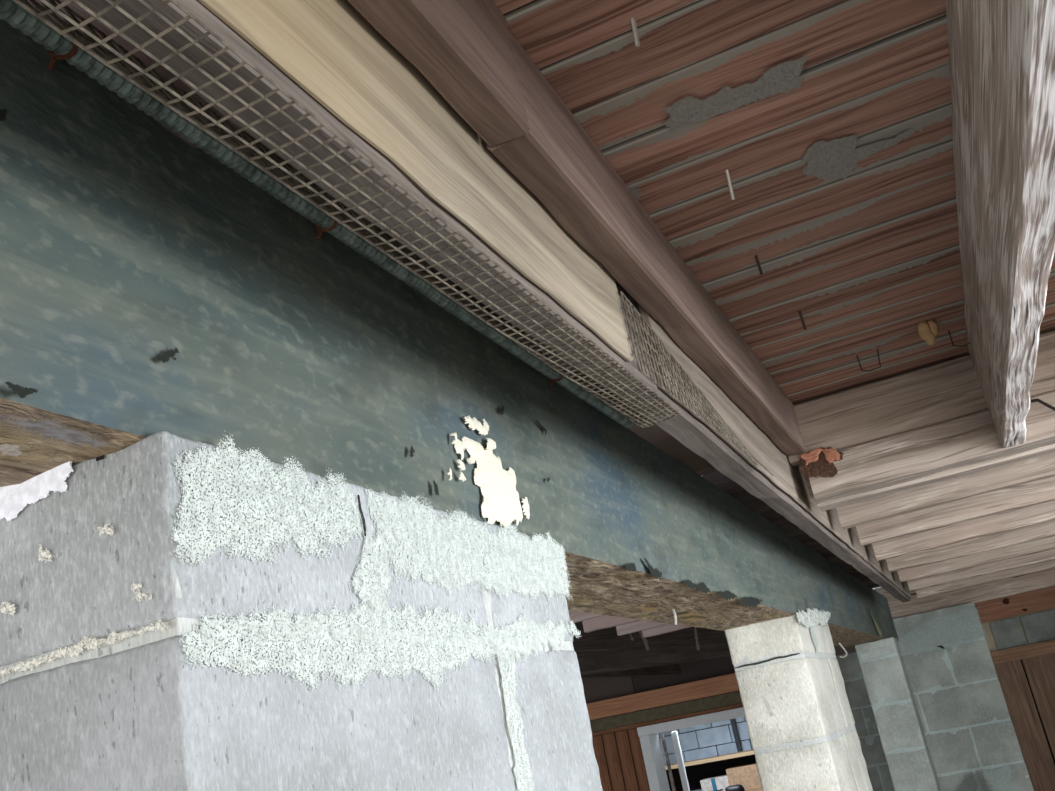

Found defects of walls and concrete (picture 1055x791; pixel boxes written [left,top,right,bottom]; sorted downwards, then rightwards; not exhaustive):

spalling [0,0,634,428]
peeling [0,407,121,461]
peeling [450,416,496,451]
peeling [433,457,475,496]
peeling [521,497,530,519]